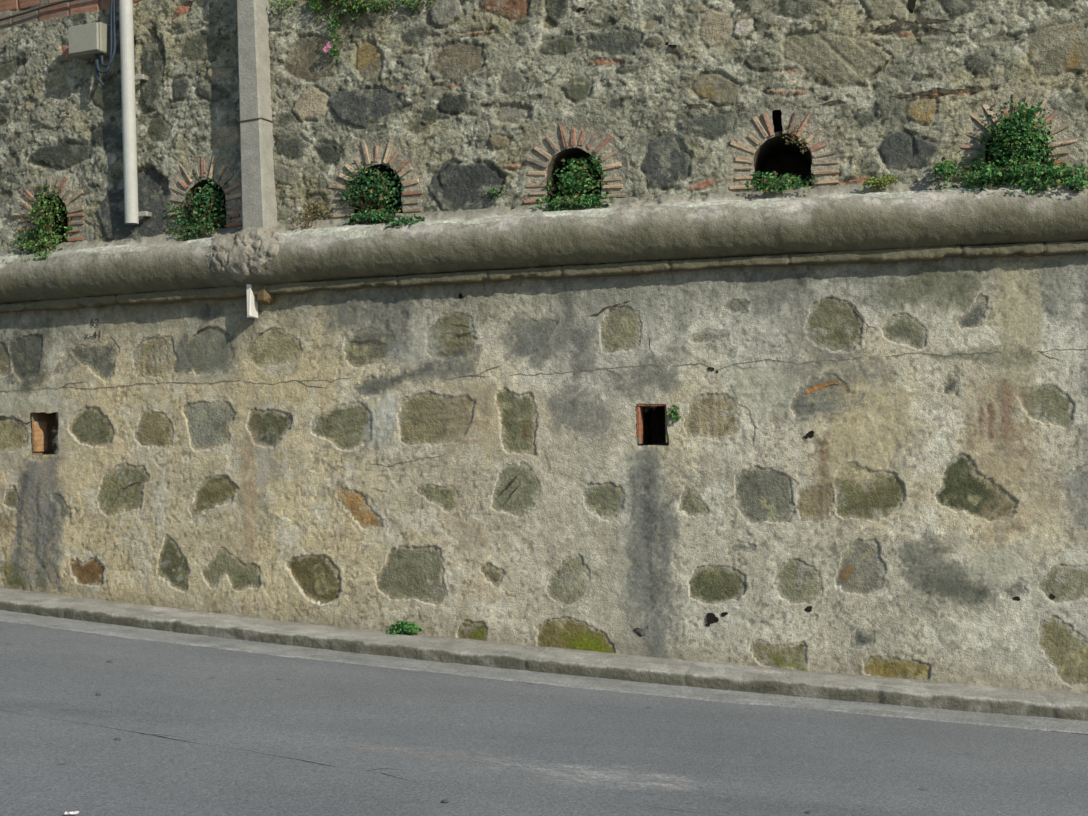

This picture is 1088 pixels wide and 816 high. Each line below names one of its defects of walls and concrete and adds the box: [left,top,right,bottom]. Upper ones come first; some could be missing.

leakage [0,320,65,427]
crack [444,324,470,336]
crack [448,304,878,445]
crack [889,349,1088,361]
leakage [0,452,63,592]
leakage [623,452,679,658]